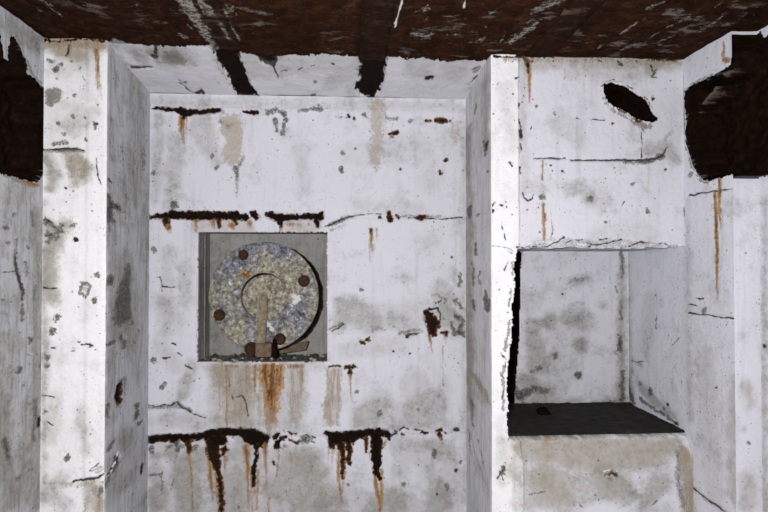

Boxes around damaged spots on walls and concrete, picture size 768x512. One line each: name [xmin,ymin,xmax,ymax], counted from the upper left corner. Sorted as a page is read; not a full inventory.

spalling [0,36,61,188]
rust [151,106,221,143]
crack [518,103,667,202]
hole [601,79,657,132]
hole [683,34,768,184]
rust [150,209,324,230]
spalling [516,236,678,248]
rust [713,178,722,288]
hole [114,377,125,405]
rust [149,363,287,512]
rust [323,427,391,512]